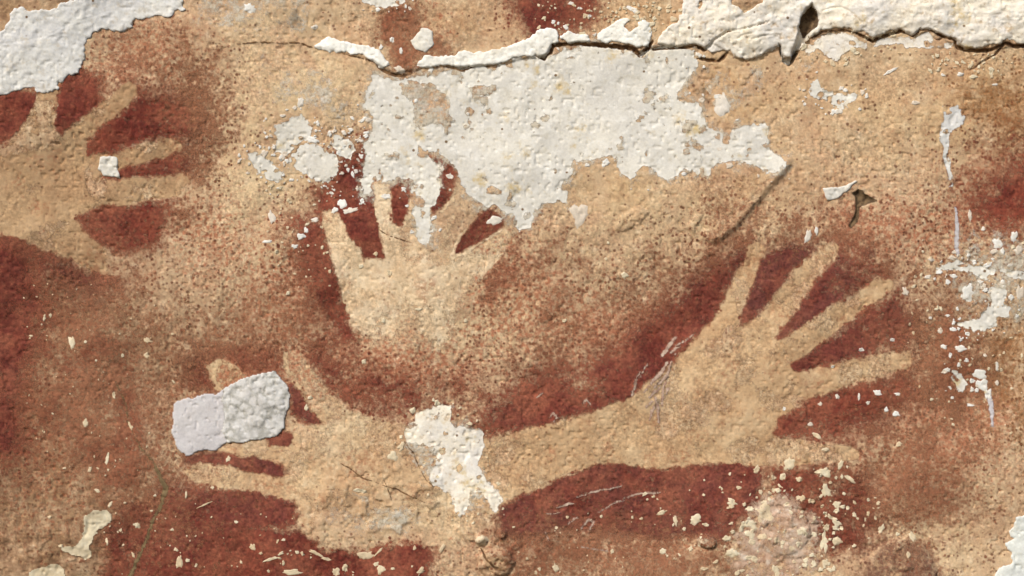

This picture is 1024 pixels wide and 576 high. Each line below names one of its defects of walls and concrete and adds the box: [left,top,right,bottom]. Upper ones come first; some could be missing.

spalling [0,0,186,95]
crack [536,31,732,62]
crack [810,29,1024,70]
spalling [237,0,790,295]
spalling [823,181,877,228]
spalling [387,398,507,526]